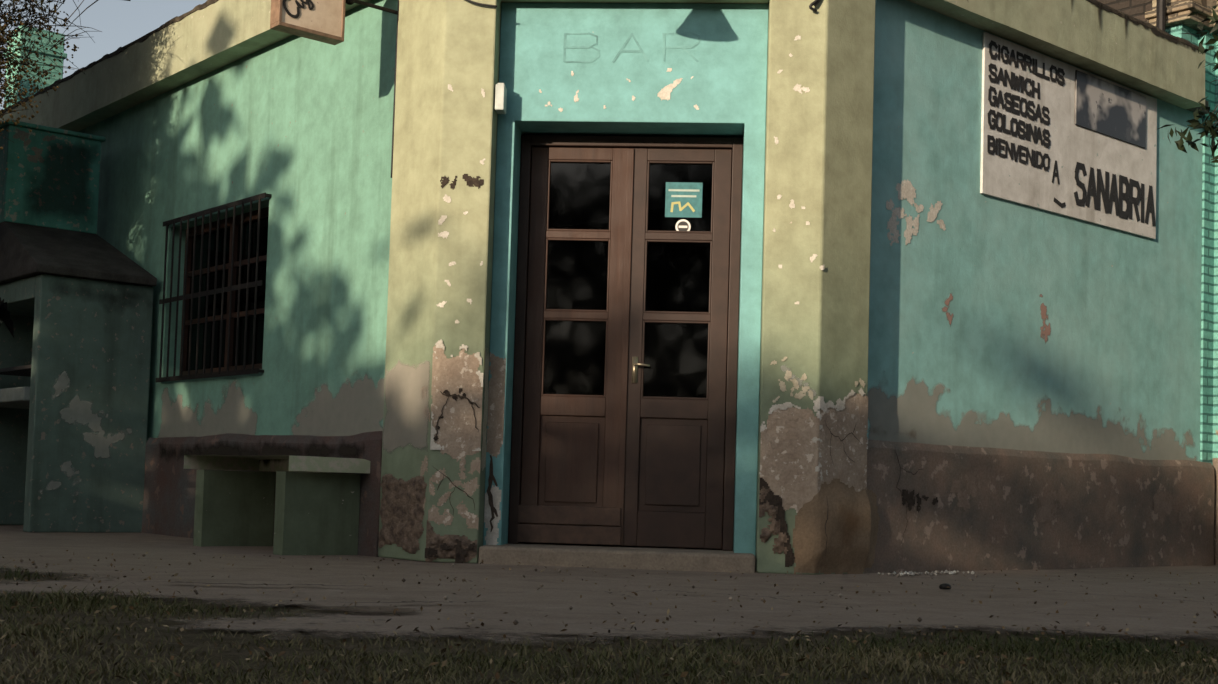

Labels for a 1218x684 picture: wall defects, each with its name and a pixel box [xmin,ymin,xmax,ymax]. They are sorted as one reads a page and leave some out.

peeling [657,68,694,100]
peeling [886,179,946,246]
peeling [292,339,506,563]
crack [435,391,498,532]
peeling [759,357,1196,567]